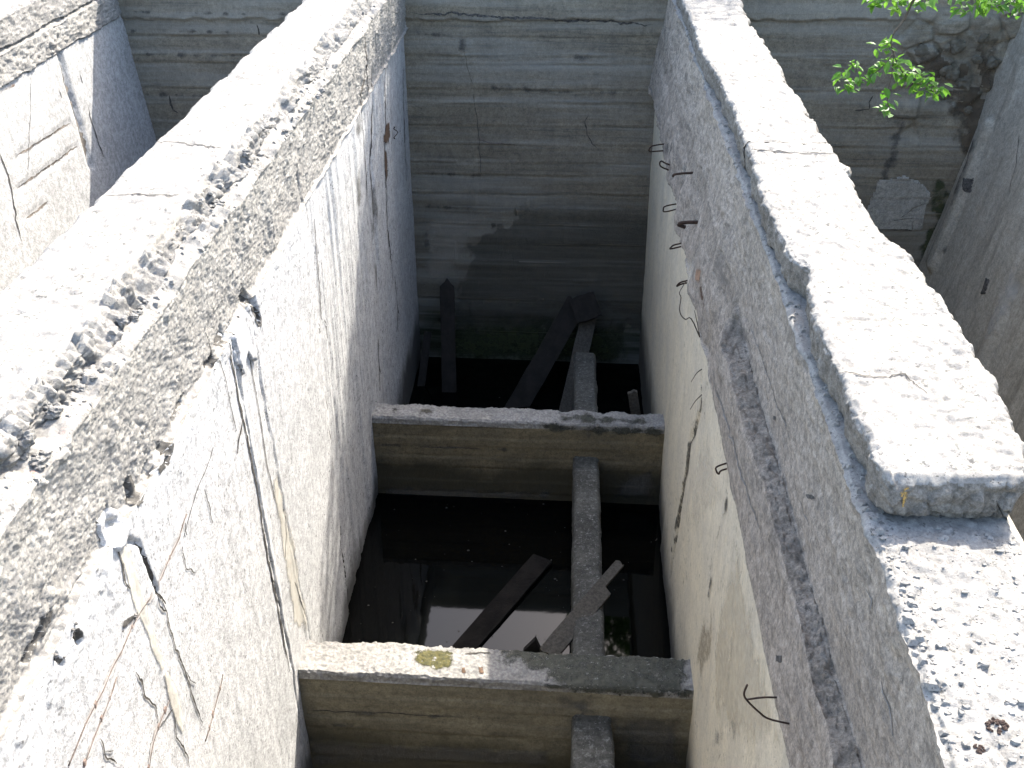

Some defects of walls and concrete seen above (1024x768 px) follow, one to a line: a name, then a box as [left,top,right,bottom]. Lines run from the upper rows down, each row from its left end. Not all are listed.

crack [411,11,647,26]
crack [0,96,31,241]
spalling [0,0,372,481]
flaking render [96,475,184,731]
crack [182,331,305,672]
crack [842,371,927,393]